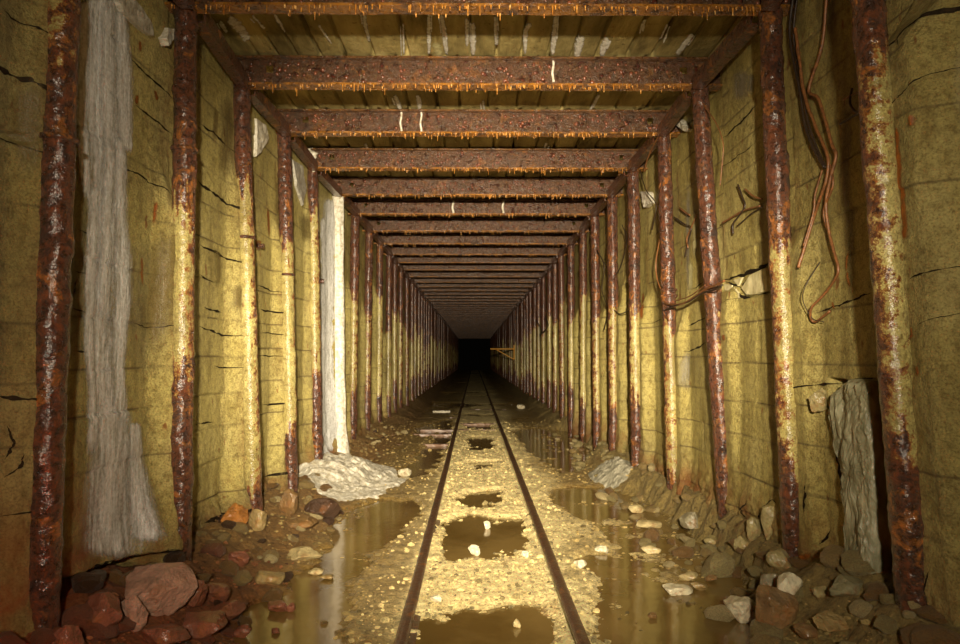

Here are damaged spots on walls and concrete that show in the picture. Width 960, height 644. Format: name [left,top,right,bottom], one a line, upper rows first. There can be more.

rust [283,0,393,20]
rust [408,0,761,20]
rust [248,61,694,96]
crack [199,182,240,209]
rust [286,113,663,257]
rust [895,129,907,238]
leakage [76,0,176,556]
leakage [298,196,406,501]
crack [0,394,37,402]
crack [6,426,24,476]
leakage [588,456,633,489]
crack [793,378,874,485]